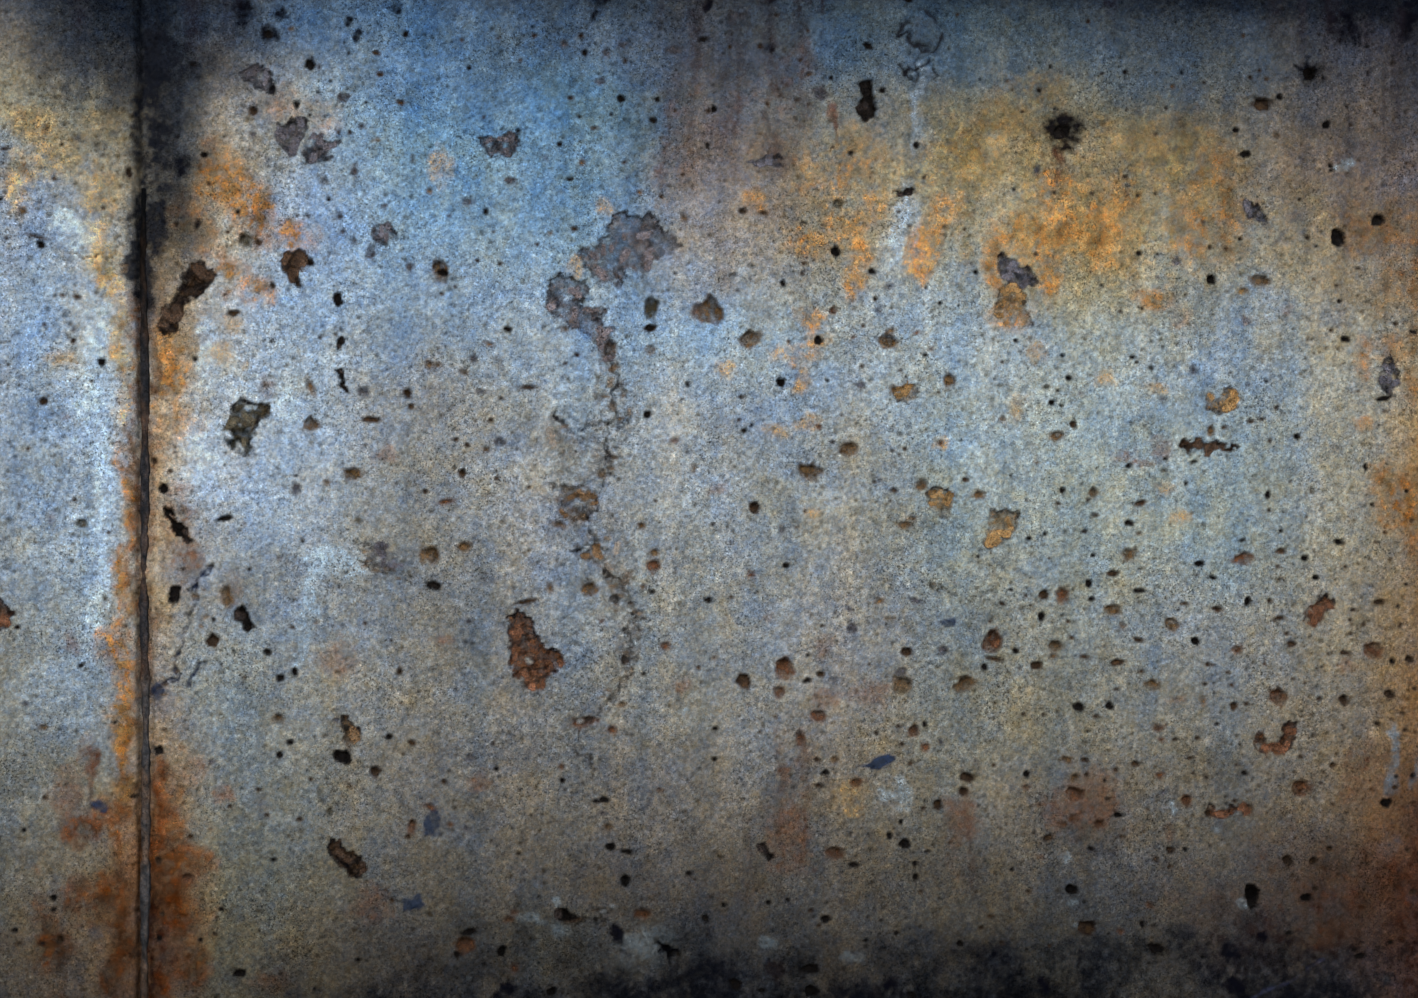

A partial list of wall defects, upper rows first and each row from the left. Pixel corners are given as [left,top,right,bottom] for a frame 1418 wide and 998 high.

corrosion [175,153,301,252]
corrosion [984,127,1127,295]
spalling [157,261,215,336]
peeling [546,209,675,418]
spalling [994,252,1038,327]
spalling [224,400,270,457]
crack [603,363,626,475]
corrosion [61,463,199,847]
spalling [506,585,565,691]
crack [574,503,652,760]
corrosion [65,760,206,998]
damp [348,920,1404,998]